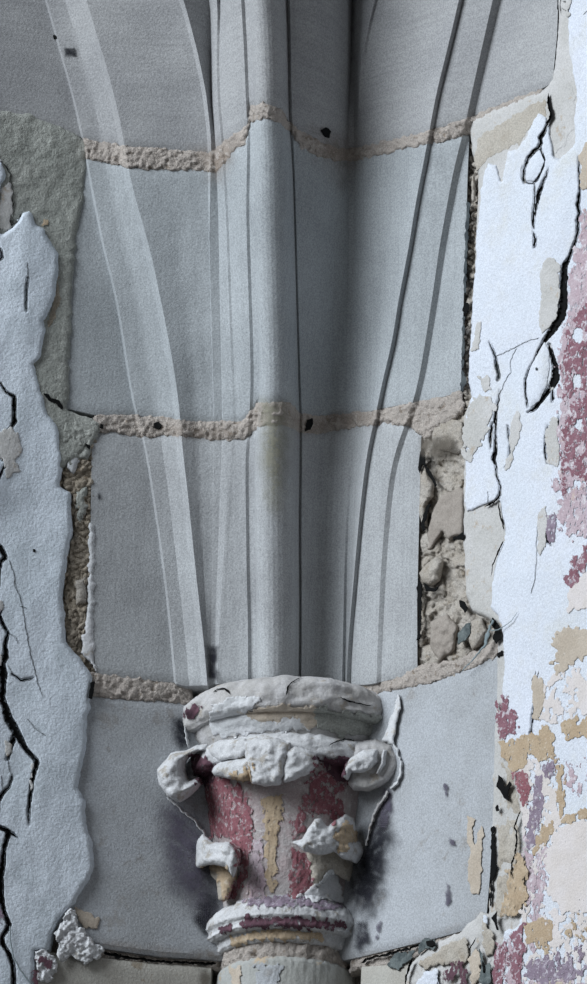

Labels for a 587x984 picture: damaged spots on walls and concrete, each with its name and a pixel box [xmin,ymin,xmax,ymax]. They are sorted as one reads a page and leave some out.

crack [520,93,553,248]
crack [0,383,16,427]
spalling [417,74,577,666]
crack [485,160,580,575]
peeling [537,208,587,613]
spalling [63,444,98,672]
crack [0,545,46,984]
peeling [188,754,358,948]
peeling [183,695,382,739]
water stain [356,922,381,950]
water stain [355,789,392,909]
spalling [406,625,587,984]